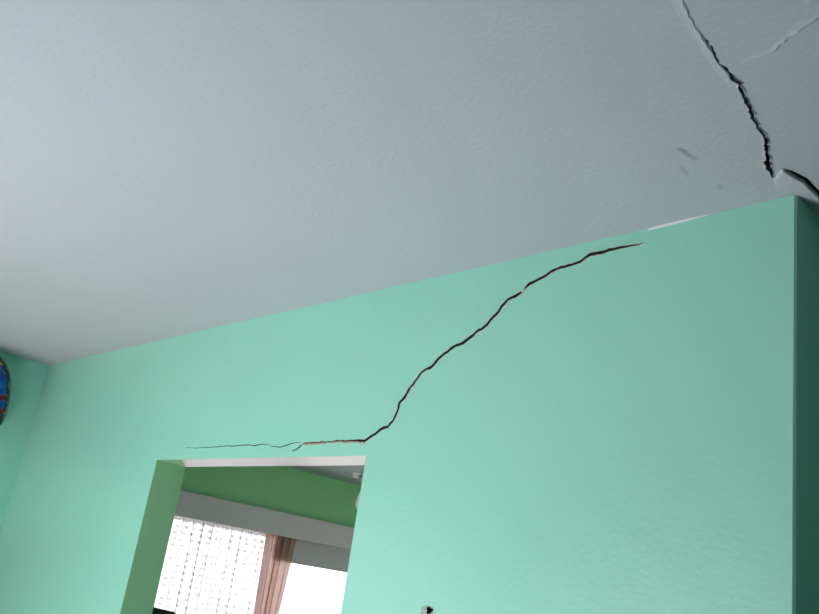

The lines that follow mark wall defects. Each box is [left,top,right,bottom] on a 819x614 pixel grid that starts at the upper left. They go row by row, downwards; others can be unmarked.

crack [670,0,819,214]
crack [187,242,644,451]